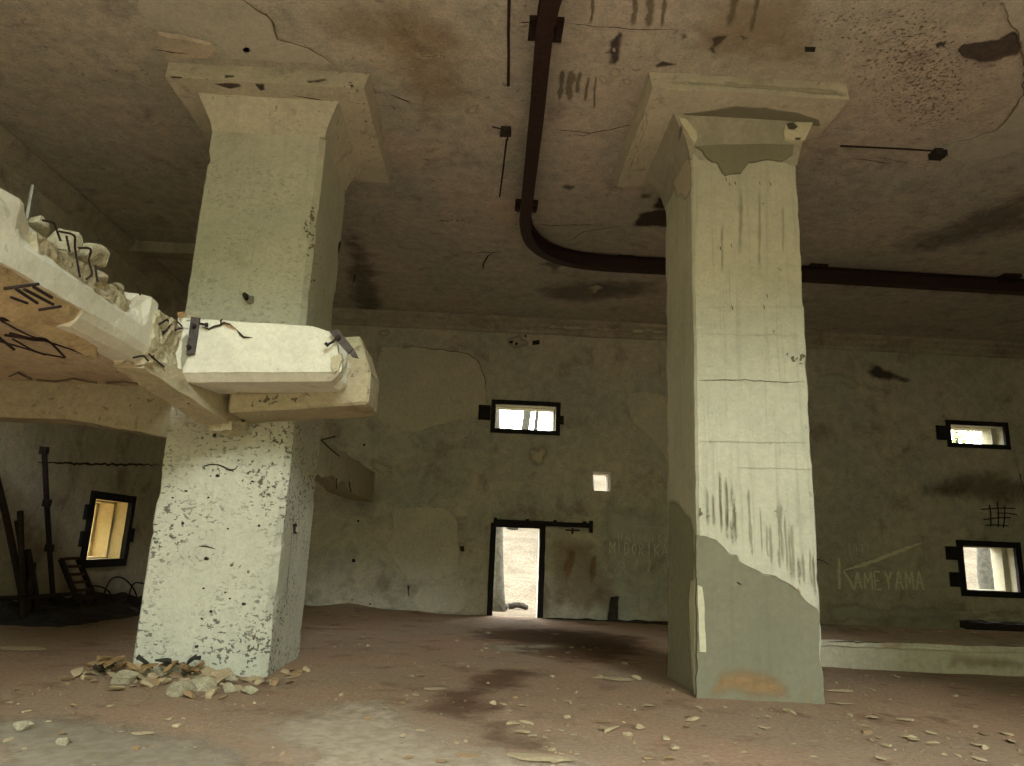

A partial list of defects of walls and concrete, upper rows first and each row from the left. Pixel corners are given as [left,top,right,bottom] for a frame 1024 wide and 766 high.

leakage [558,33,630,107]
spalling [813,1,1021,132]
peeling [673,106,820,198]
spalling [42,219,98,282]
spalling [3,282,62,311]
spalling [0,317,87,359]
leakage [476,630,641,662]
peeling [667,502,825,728]
leakage [426,670,531,718]